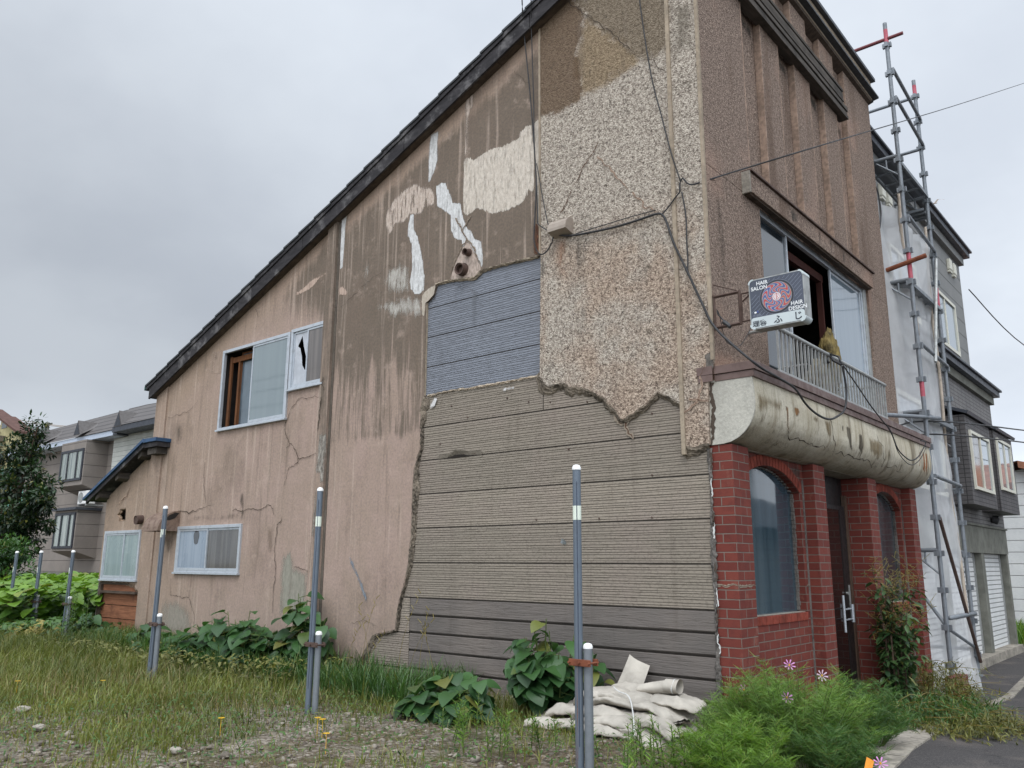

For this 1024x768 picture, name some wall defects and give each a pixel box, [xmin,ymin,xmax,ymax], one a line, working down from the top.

peeling [385,95,539,315]
crack [234,505,305,611]
crack [284,377,324,483]
flaking render [357,372,680,668]
flaking render [680,441,713,497]
crack [786,408,898,472]
damp [842,427,890,457]